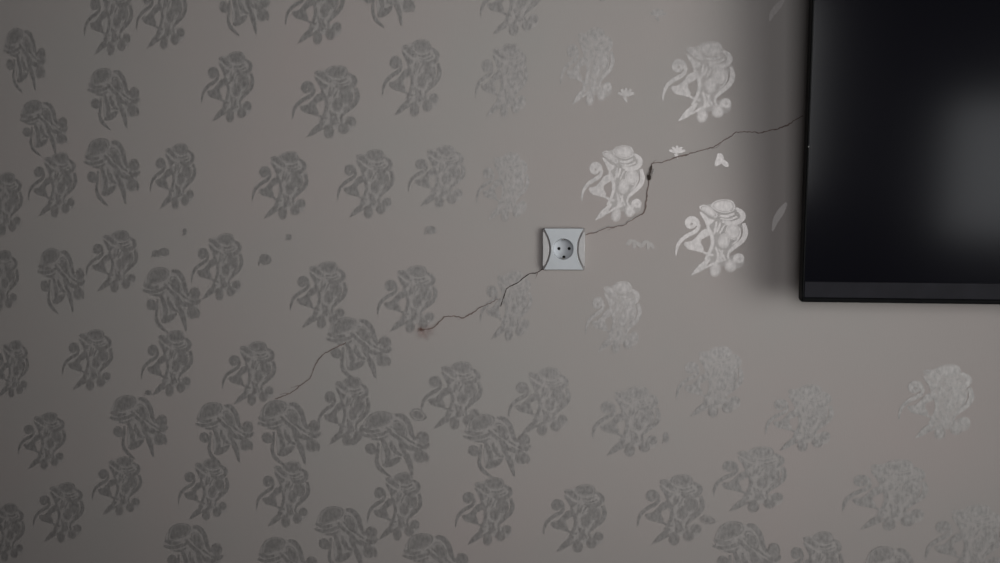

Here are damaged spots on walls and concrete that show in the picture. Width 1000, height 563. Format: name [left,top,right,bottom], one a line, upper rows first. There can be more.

crack [585,115,803,235]
crack [422,269,543,331]
crack [275,342,346,399]